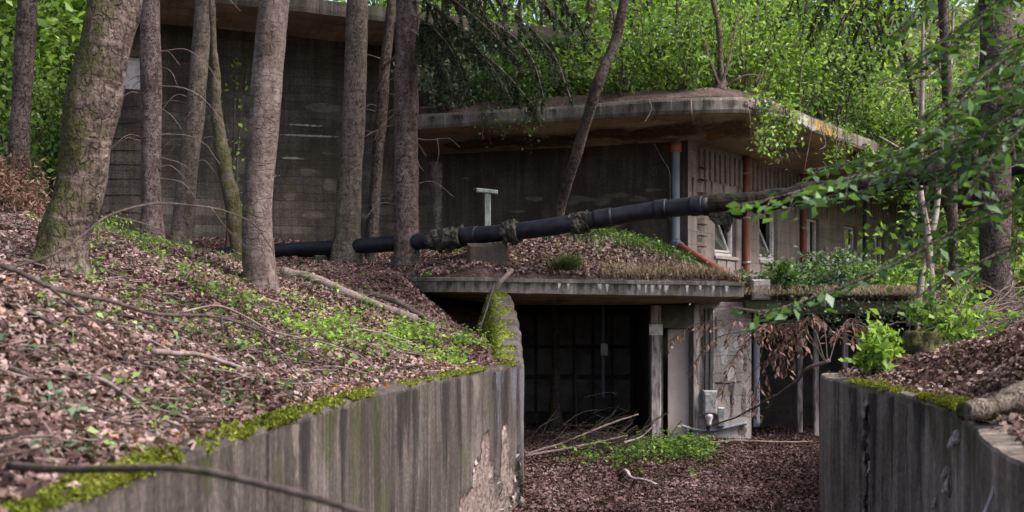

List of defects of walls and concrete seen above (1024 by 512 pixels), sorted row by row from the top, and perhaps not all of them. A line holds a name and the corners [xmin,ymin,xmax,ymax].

spalling [459,422,524,512]